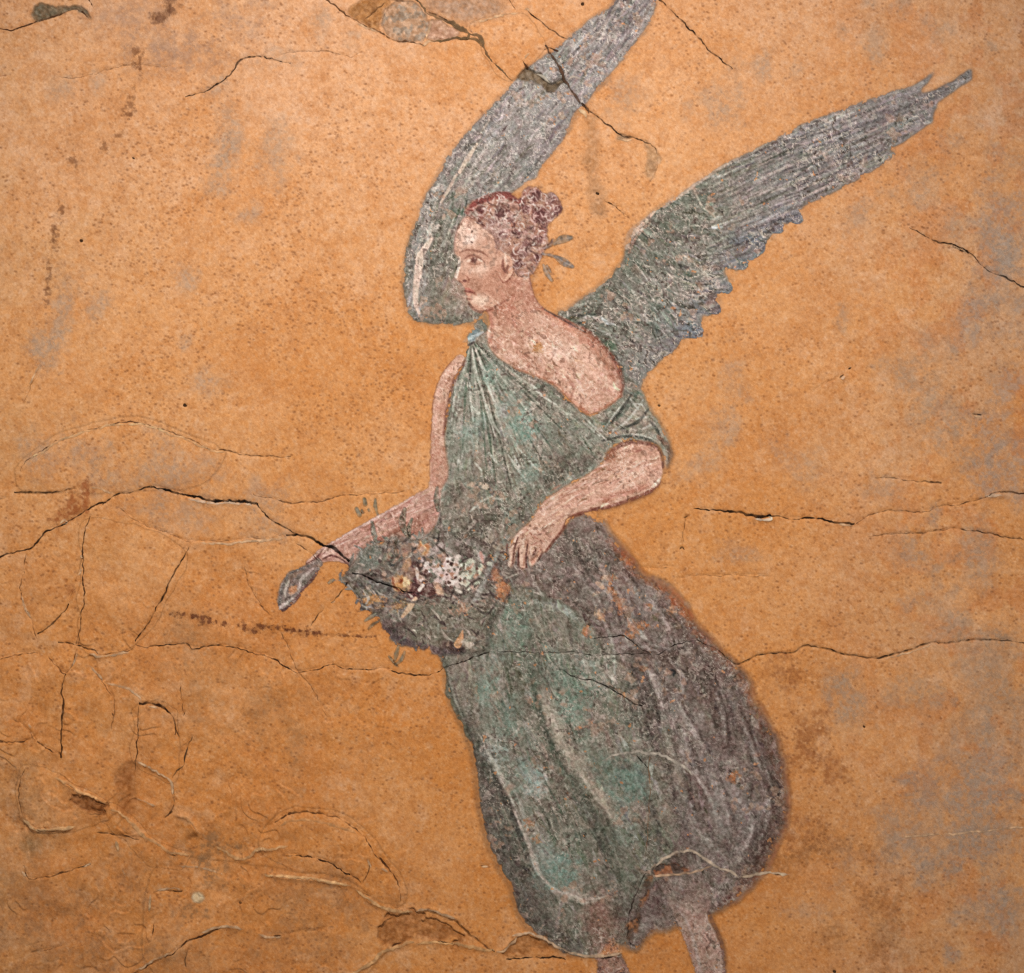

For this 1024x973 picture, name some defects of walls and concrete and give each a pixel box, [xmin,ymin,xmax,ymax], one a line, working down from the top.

spalling [349,0,459,43]
crack [327,0,656,149]
crack [916,230,1024,287]
crack [27,421,272,460]
crack [680,508,875,549]
crack [930,481,1024,538]
crack [551,634,938,706]
crack [0,486,786,973]